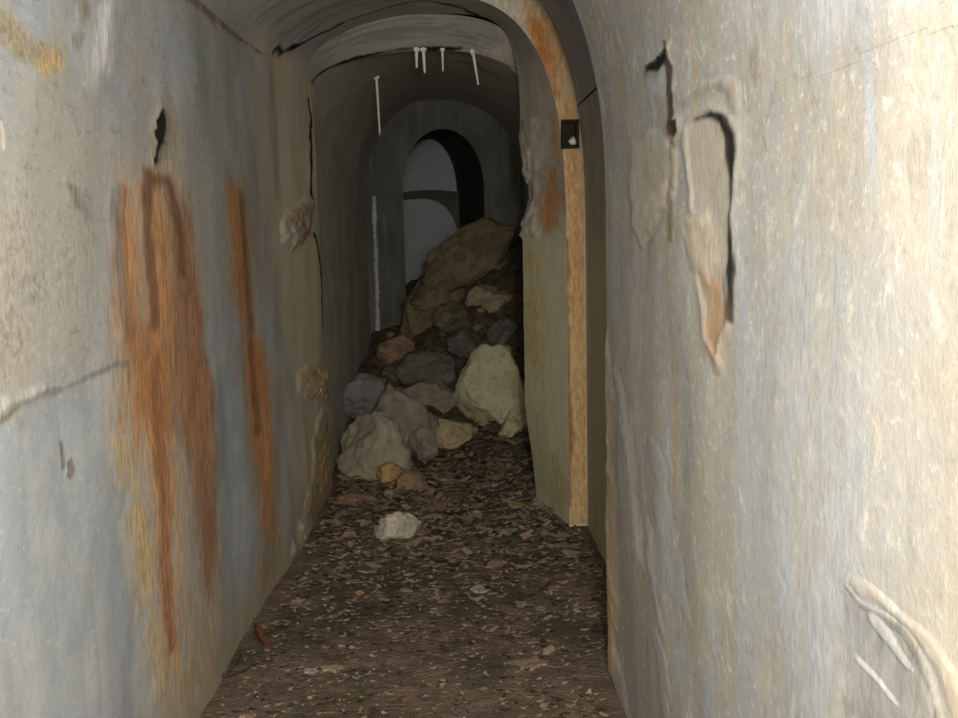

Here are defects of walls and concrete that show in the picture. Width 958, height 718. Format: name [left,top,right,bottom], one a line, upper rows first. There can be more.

crack [174,0,507,62]
crack [307,44,464,365]
spalling [519,115,548,241]
crack [661,36,678,246]
spalling [626,65,758,385]
crack [0,360,122,428]
corrosion [78,124,288,718]